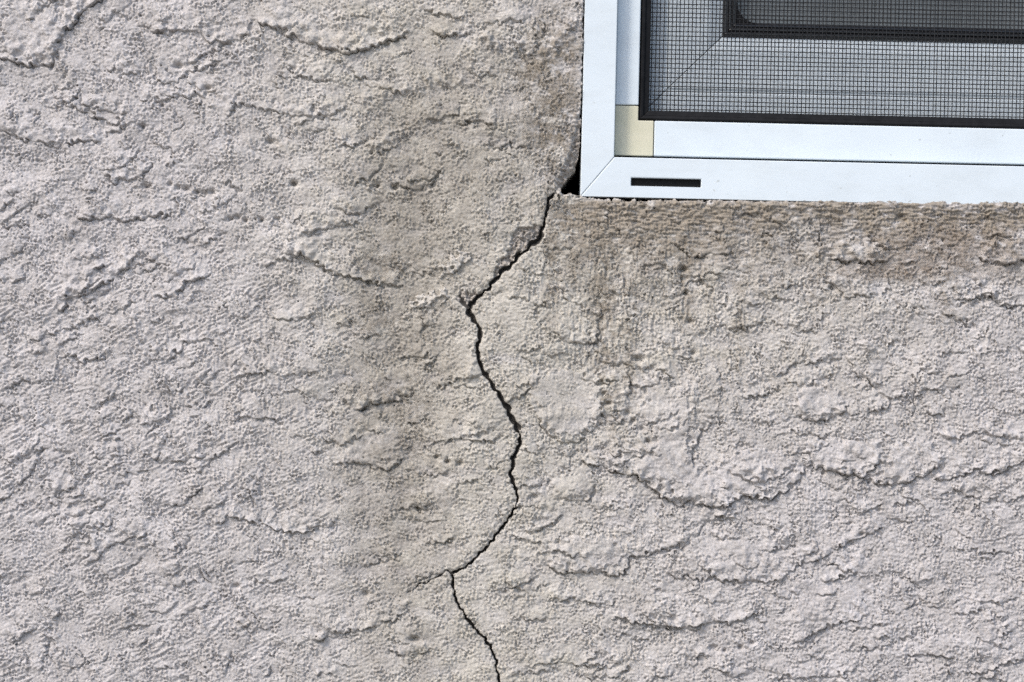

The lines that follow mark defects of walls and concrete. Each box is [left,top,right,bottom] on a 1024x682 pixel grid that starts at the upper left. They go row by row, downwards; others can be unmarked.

crack [408,194,554,682]